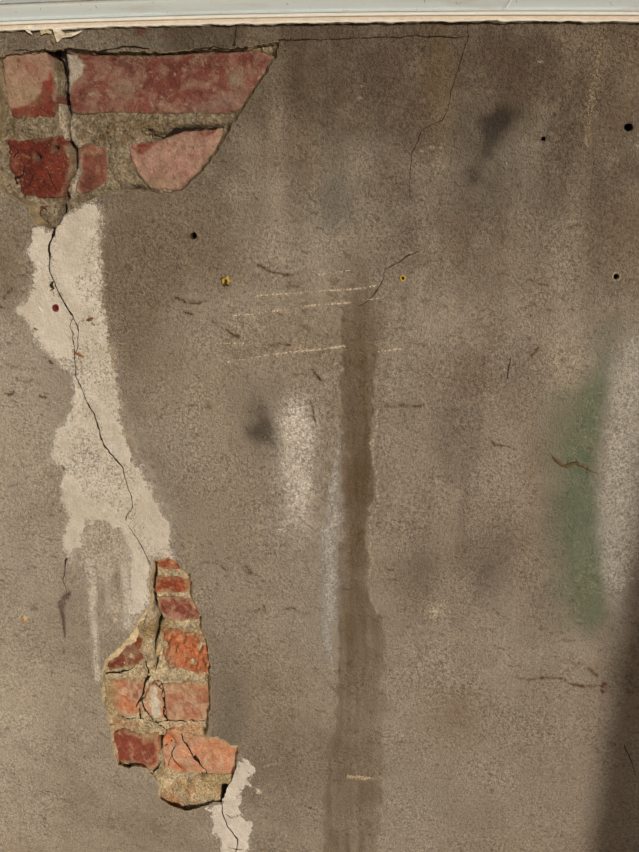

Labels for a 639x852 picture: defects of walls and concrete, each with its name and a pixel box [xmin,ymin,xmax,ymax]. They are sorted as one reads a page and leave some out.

flaking render [0,25,281,229]
crack [278,24,469,184]
crack [48,227,150,563]
damp [321,450,343,663]
damp [348,341,381,615]
flaking render [101,557,240,812]
crack [221,803,242,852]